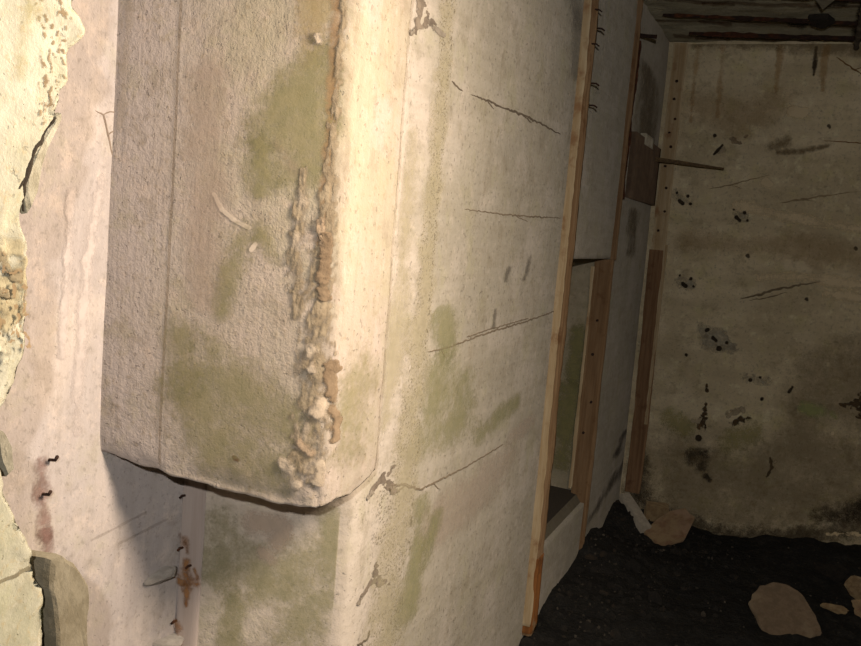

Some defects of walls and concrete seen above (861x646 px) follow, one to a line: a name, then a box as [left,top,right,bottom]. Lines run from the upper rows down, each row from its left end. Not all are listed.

spalling [644,0,861,50]
crack [452,81,560,134]
crack [96,111,115,155]
crack [18,117,57,211]
spalling [277,0,347,491]
spalling [0,236,31,364]
crack [741,280,827,301]
crack [428,311,554,357]
crack [389,444,503,492]
rust [177,559,199,607]